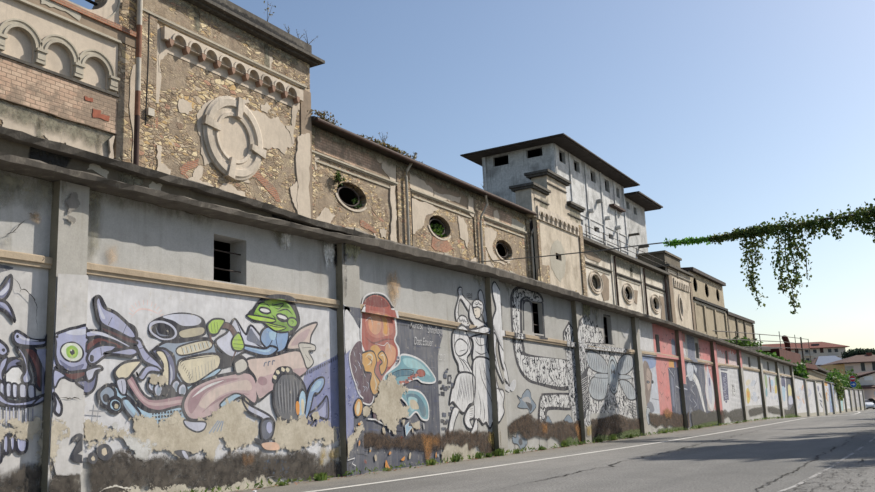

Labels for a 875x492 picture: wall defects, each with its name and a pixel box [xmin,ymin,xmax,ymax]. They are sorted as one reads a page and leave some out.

peeling [149,374,168,387]
peeling [0,416,70,469]
peeling [83,398,260,461]
peeling [272,372,420,458]
leakage [364,404,795,455]
leakage [0,449,349,492]